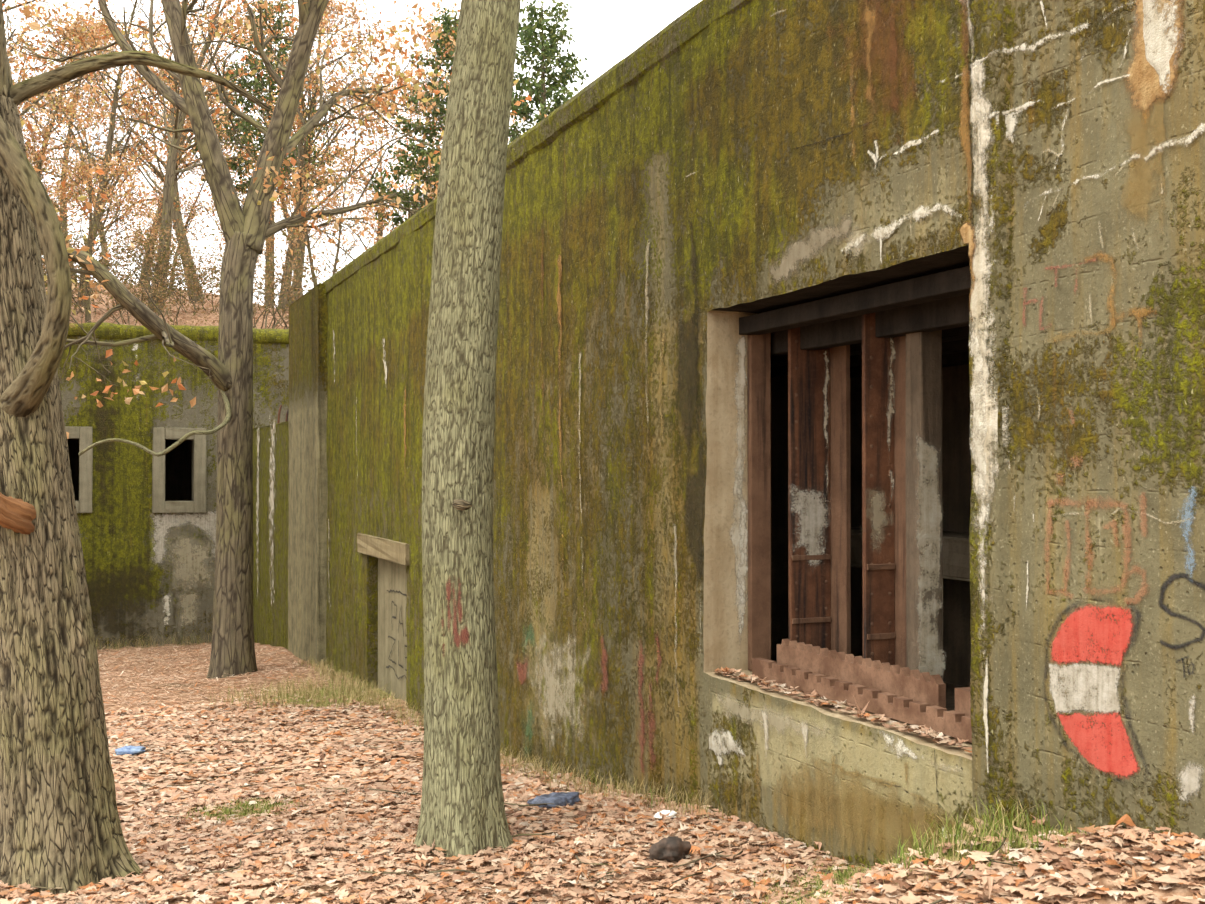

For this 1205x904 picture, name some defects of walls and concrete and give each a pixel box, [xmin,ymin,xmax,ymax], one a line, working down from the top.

rust [959,67,971,204]
water stain [961,0,1007,601]
peeling [709,696,820,765]